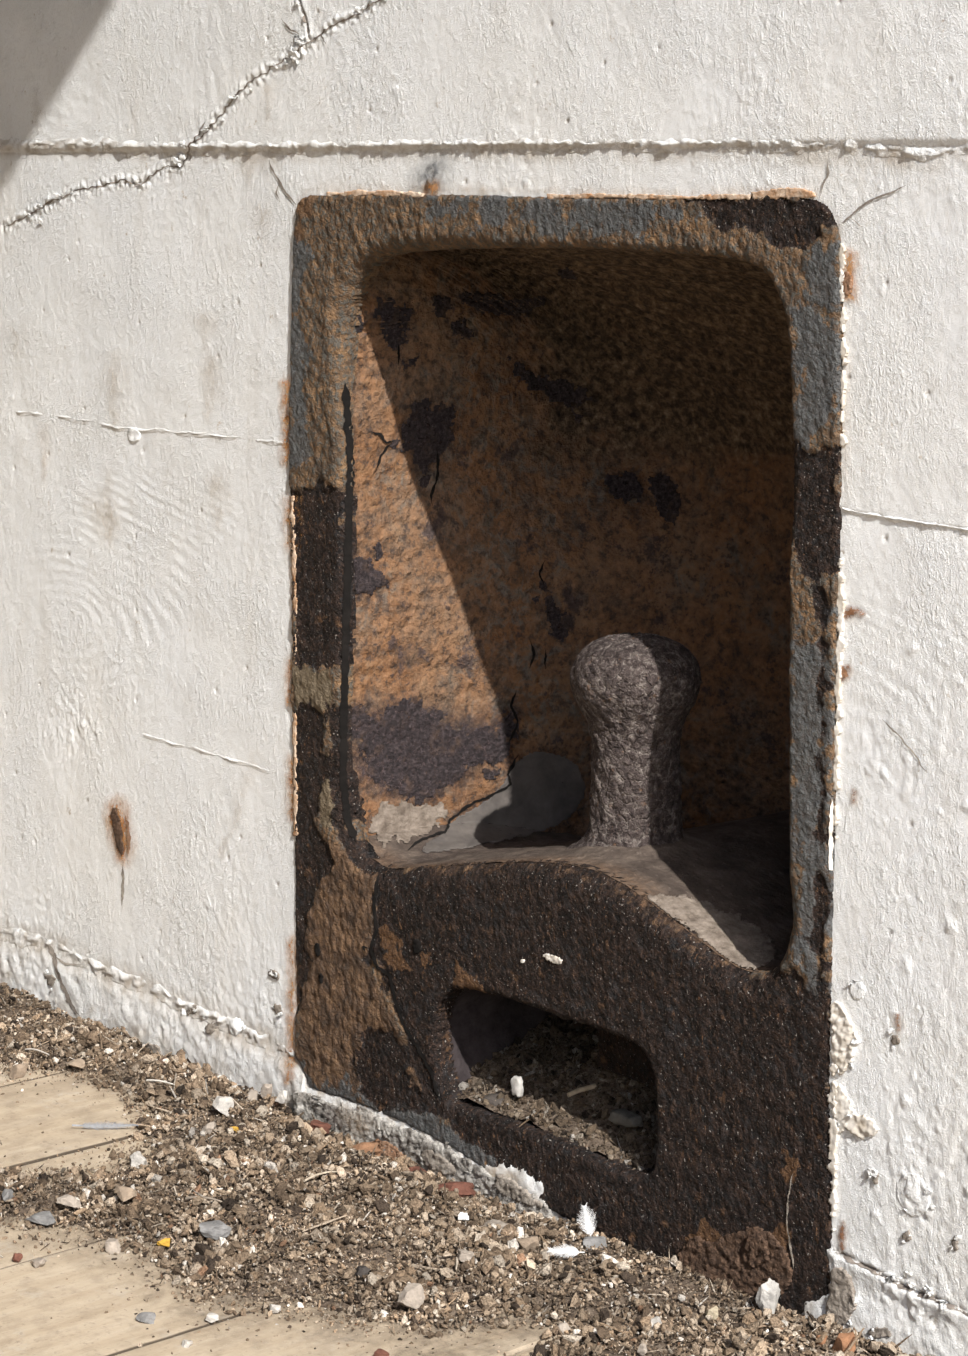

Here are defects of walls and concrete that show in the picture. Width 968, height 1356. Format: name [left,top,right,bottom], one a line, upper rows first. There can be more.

crack [4,0,387,227]
corrosion [355,296,419,371]
corrosion [431,291,546,340]
corrosion [368,398,456,506]
corrosion [604,471,682,526]
corrosion [354,542,389,596]
corrosion [529,561,570,669]
corrosion [351,692,586,853]
corrosion [108,804,131,902]
corrosion [648,893,777,970]
corrosion [309,1119,332,1135]
corrosion [677,1226,793,1298]